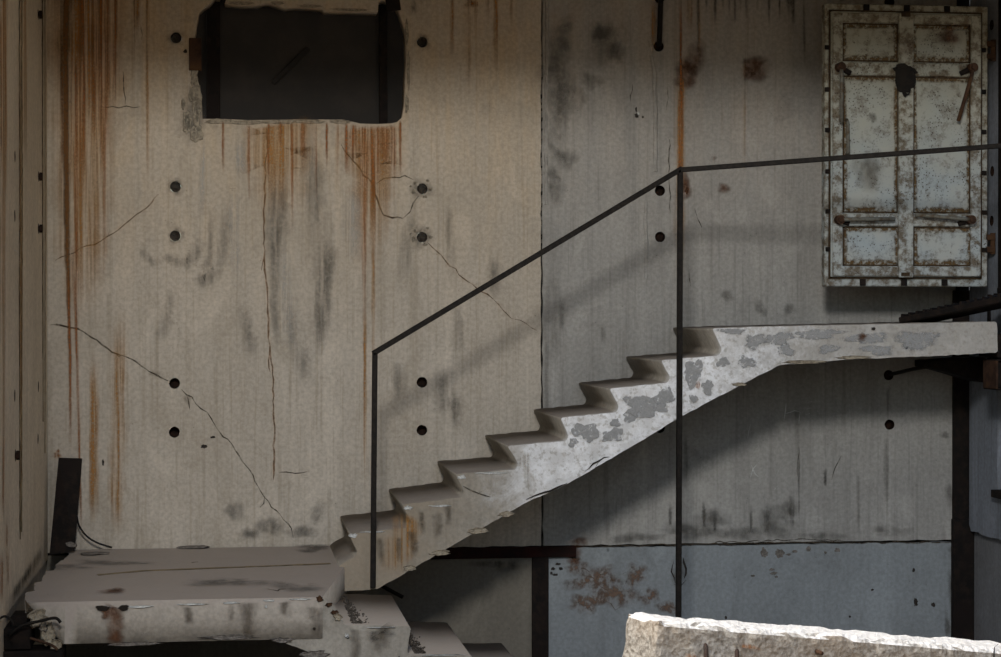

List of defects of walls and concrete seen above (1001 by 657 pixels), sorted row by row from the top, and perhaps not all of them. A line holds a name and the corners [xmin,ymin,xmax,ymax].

spalling [181,70,352,143]
corrosion [677,9,701,167]
corrosion [263,122,305,184]
corrosion [345,123,401,243]
corrosion [60,0,117,508]
crack [427,242,537,331]
corrosion [111,361,123,510]
peeling [568,387,675,447]
peeling [685,359,714,403]
peeling [716,327,940,368]